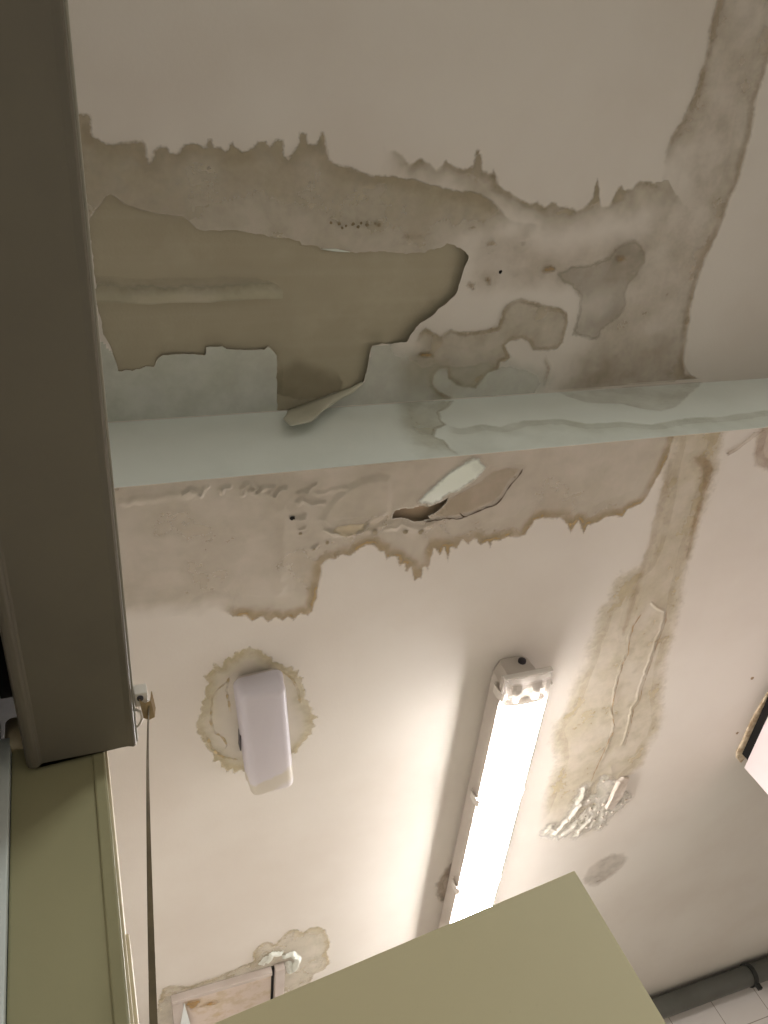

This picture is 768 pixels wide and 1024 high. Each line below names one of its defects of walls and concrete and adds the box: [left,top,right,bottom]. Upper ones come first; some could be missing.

damp [79,114,496,244]
peeling [89,194,469,426]
peeling [392,459,485,522]
spalling [540,775,632,839]